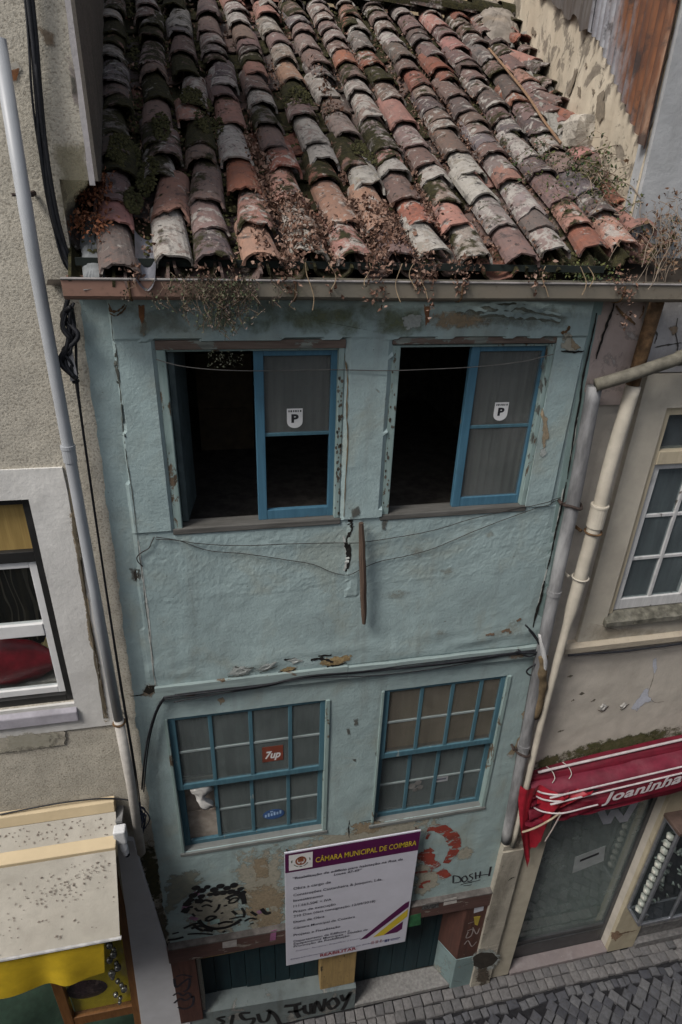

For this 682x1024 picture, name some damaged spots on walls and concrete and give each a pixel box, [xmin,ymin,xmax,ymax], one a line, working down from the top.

spalling [507,17,604,123]
peeling [335,361,349,515]
crack [533,303,681,628]
crack [343,520,354,572]
spalling [227,654,351,677]
peeling [164,818,442,933]